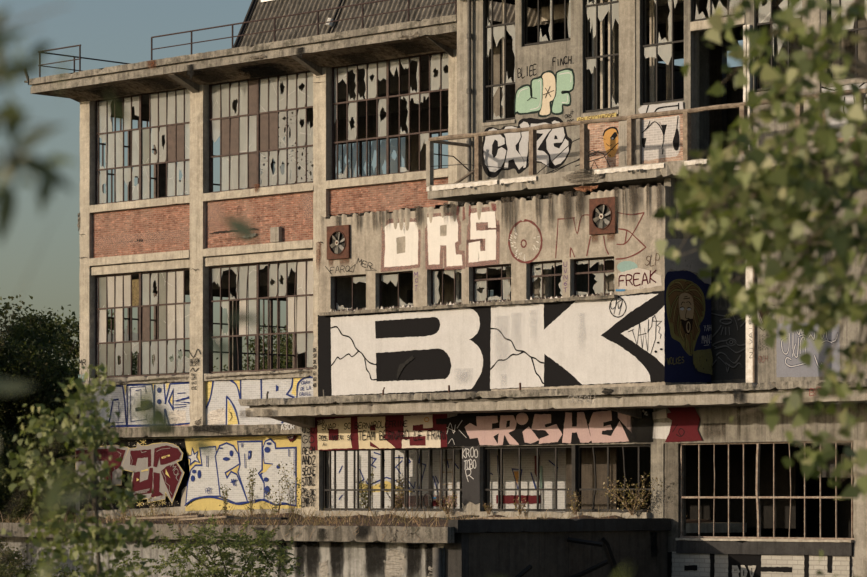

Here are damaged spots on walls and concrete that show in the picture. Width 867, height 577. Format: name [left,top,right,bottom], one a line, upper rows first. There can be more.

leakage [277,528,343,577]
leakage [356,526,386,577]
leakage [406,543,434,577]